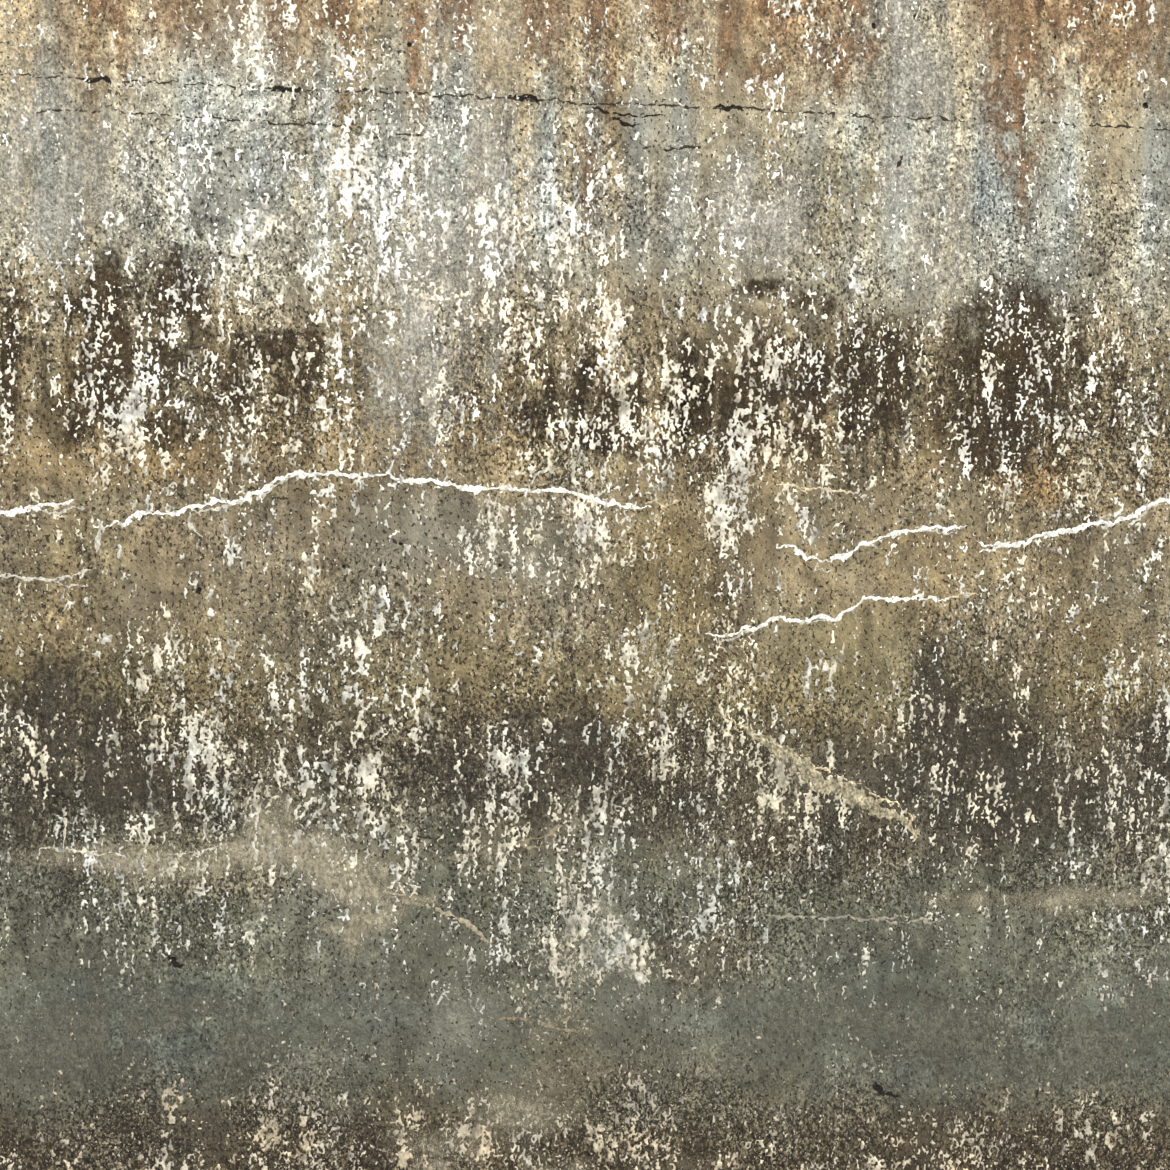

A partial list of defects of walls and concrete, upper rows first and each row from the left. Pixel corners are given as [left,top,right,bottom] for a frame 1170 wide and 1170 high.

corrosion [150,0,246,46]
corrosion [266,0,354,61]
corrosion [442,0,474,50]
crack [1,73,1168,152]
corrosion [973,0,1089,131]
water stain [55,243,209,444]
water stain [515,318,918,467]
water stain [937,282,1126,474]
crack [0,467,680,590]
crack [776,498,1170,573]
crack [706,592,979,642]
water stain [897,641,1139,848]